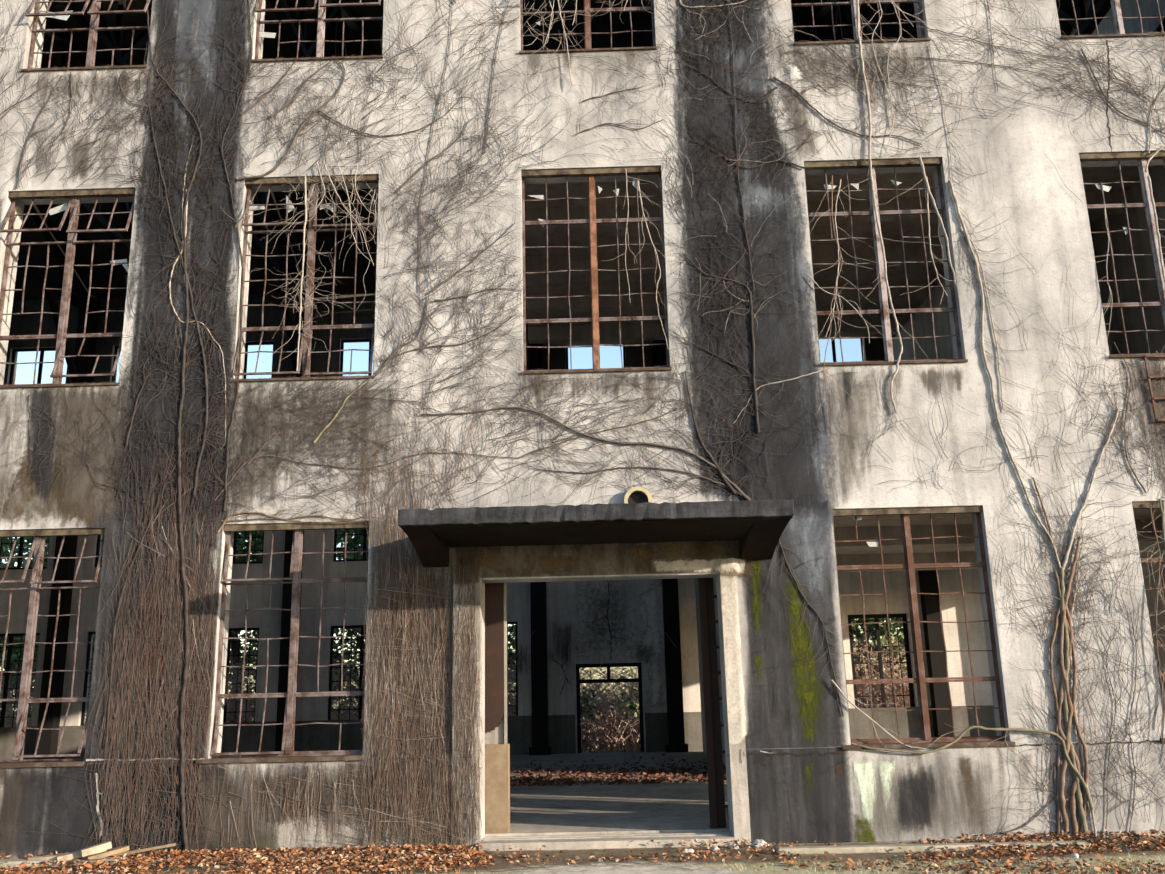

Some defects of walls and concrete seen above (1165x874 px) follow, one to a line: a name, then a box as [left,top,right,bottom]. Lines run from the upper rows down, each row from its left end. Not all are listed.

water stain [0,0,466,859]
water stain [674,0,989,845]
corrosion [1125,361,1165,490]